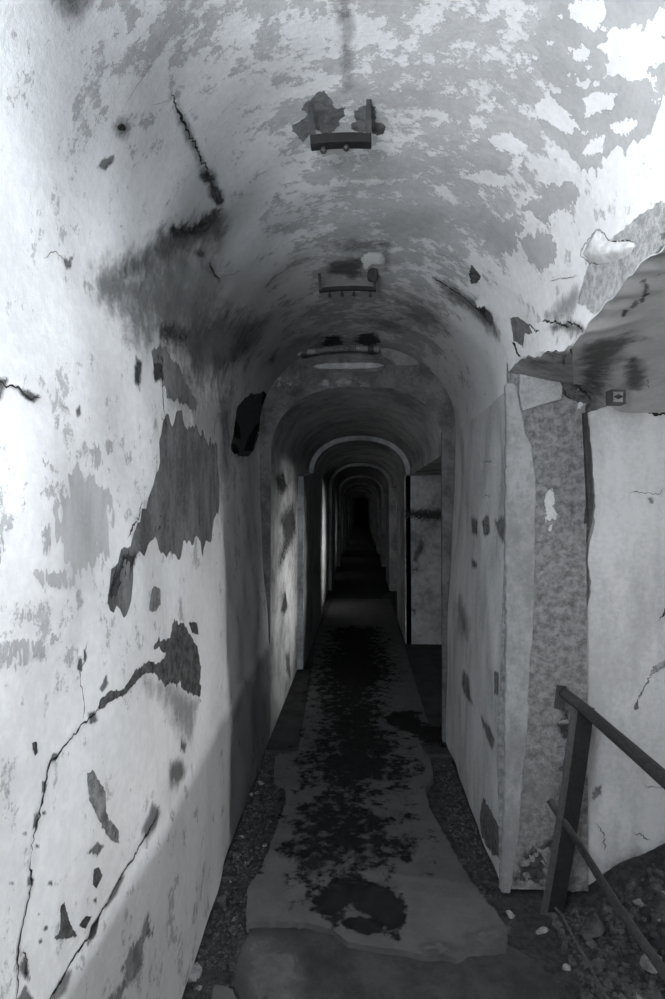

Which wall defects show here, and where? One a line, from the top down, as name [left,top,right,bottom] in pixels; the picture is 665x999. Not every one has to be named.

crack [156,92,223,205]
spalling [292,91,386,142]
peeling [464,131,528,196]
peeling [479,0,665,274]
leakage [105,210,263,379]
spalling [33,344,266,618]
spalling [97,619,201,731]
flaking render [480,371,558,893]
crack [16,645,160,999]
spalling [87,770,119,855]
spalling [170,740,186,783]
spalling [93,867,102,902]